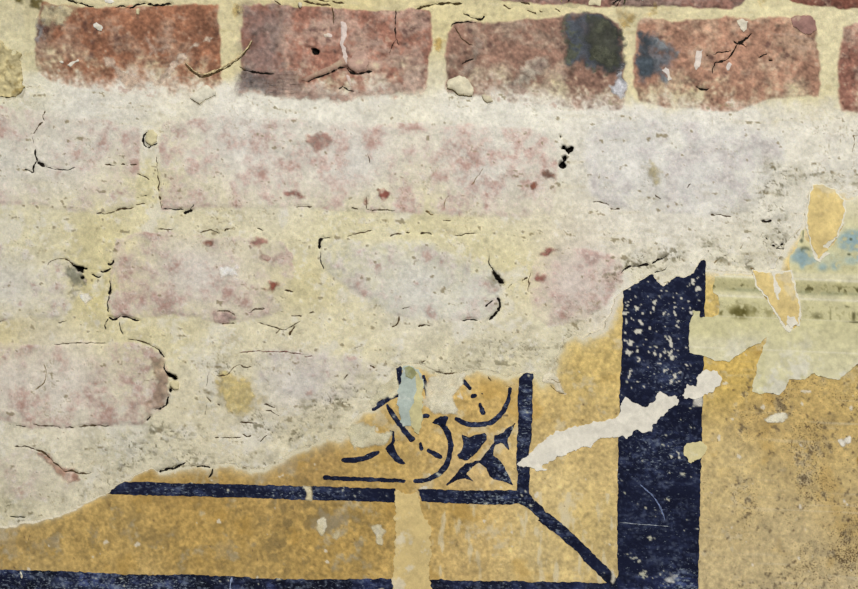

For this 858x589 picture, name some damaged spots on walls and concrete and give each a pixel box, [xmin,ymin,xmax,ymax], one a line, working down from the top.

peeling [791,15,817,34]
spalling [0,40,25,98]
crack [25,111,75,173]
crack [97,132,194,230]
spalling [559,145,574,169]
crack [318,197,474,269]
crack [48,258,169,375]
peeling [370,378,399,406]
peeling [423,373,466,414]
crack [15,424,109,474]
crack [159,462,213,477]
peeling [347,422,392,448]